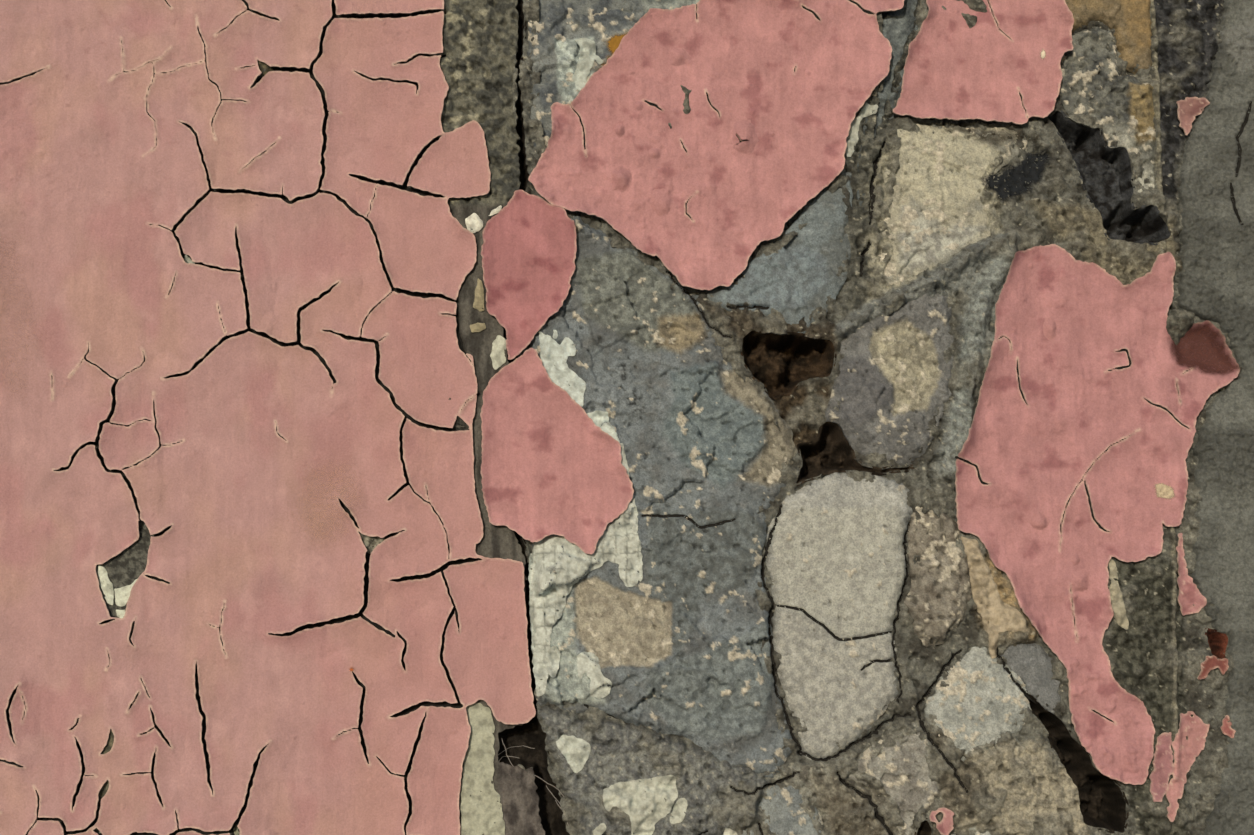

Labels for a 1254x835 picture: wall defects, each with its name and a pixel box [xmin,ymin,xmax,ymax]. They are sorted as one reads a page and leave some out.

peeling [1176,97,1210,136]
peeling [452,0,1074,555]
crack [27,0,482,835]
peeling [96,520,154,618]
crack [641,514,736,529]
peeling [955,244,1240,822]
crack [730,505,968,835]
crack [996,647,1036,704]
crack [0,689,26,767]
peeling [101,729,114,754]
peeling [670,798,688,824]
peeling [929,808,954,835]